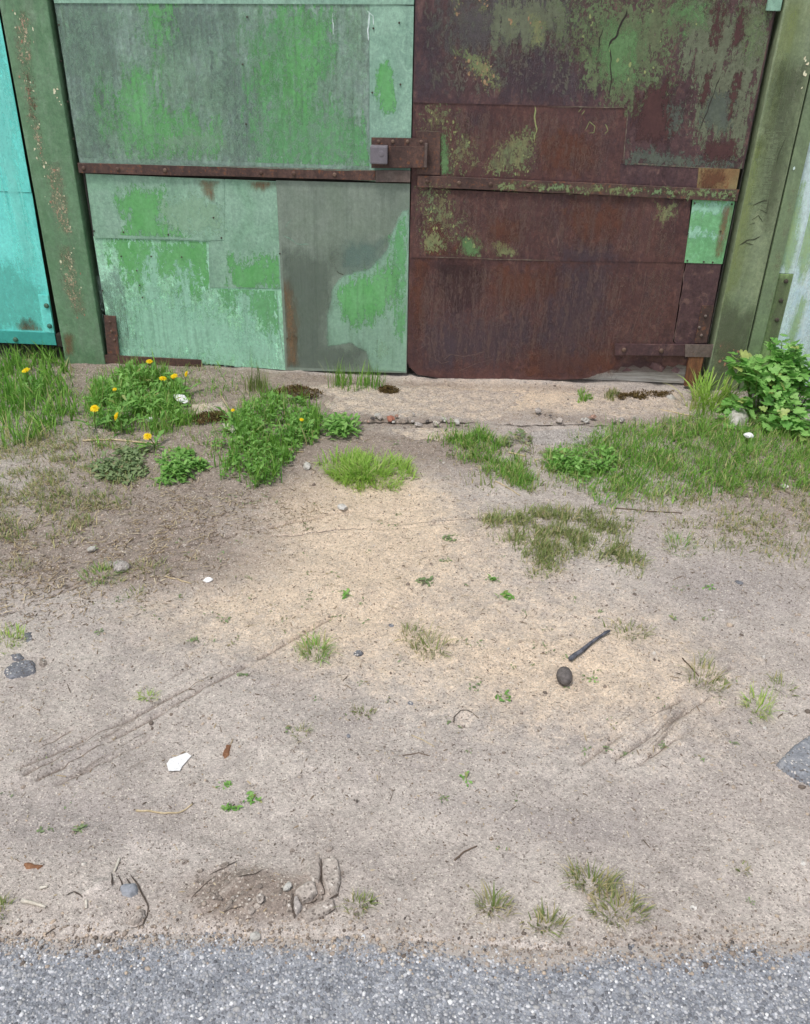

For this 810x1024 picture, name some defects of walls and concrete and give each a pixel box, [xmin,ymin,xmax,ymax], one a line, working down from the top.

crack [598,11,628,95]
corrosion [709,1,748,54]
corrosion [726,71,746,121]
peeling [327,0,774,372]
corrosion [699,138,740,189]